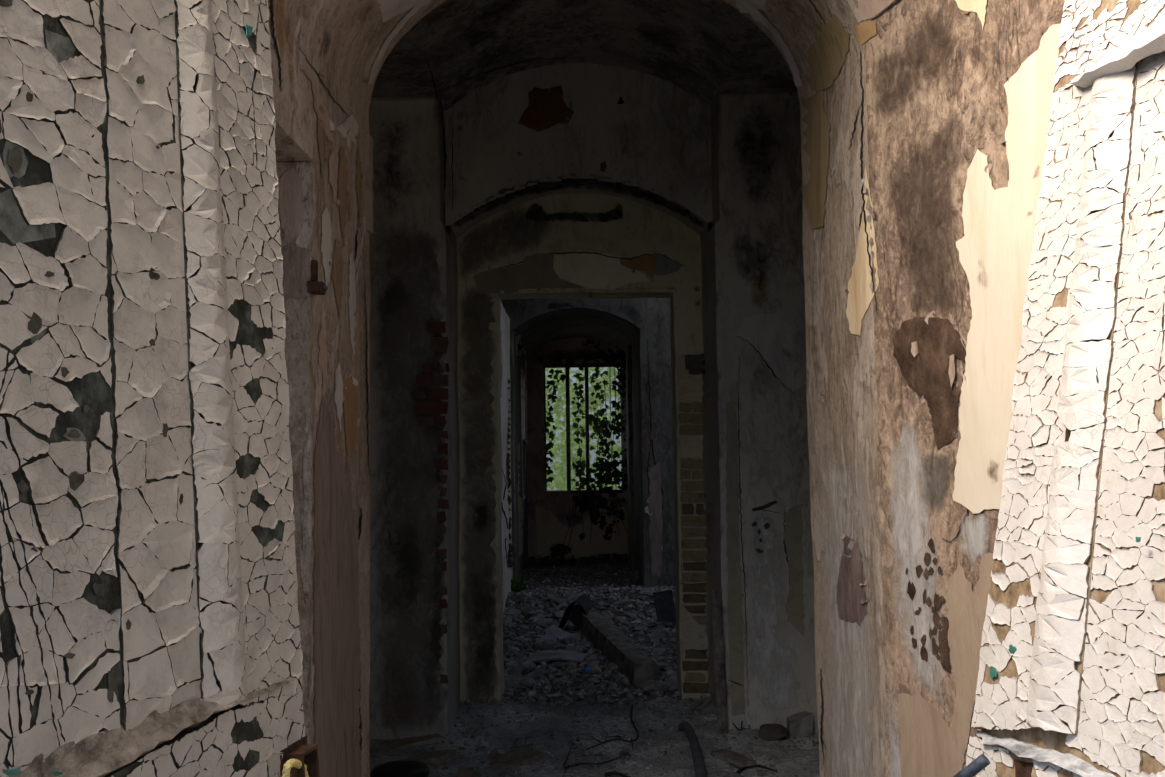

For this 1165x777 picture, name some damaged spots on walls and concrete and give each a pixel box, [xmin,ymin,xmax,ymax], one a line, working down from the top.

flaking render [518,85,574,131]
water stain [878,12,952,111]
peeling [955,0,987,30]
peeling [473,253,682,298]
peeling [845,167,879,336]
water stain [892,123,954,311]
peeling [892,23,1061,514]
flaking render [411,321,450,656]
peeling [645,462,663,576]
peeling [836,533,870,626]
crack [942,509,986,542]
flaking render [898,538,994,777]